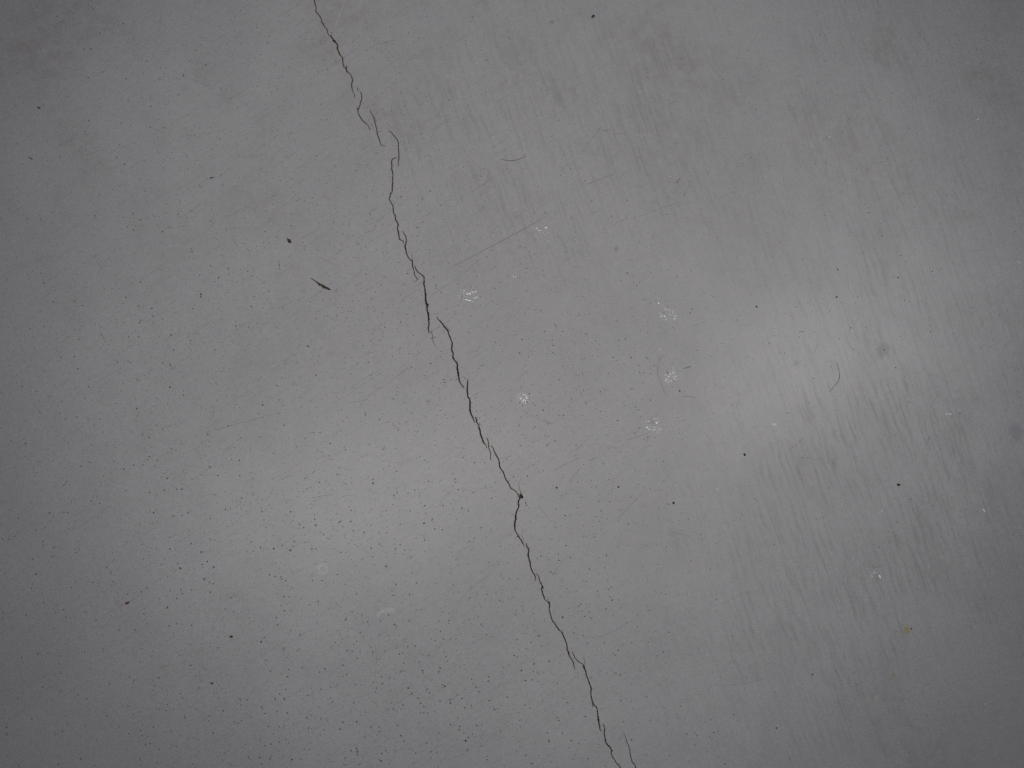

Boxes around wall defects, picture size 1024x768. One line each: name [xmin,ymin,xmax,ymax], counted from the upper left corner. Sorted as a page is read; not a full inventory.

crack [313,0,636,768]